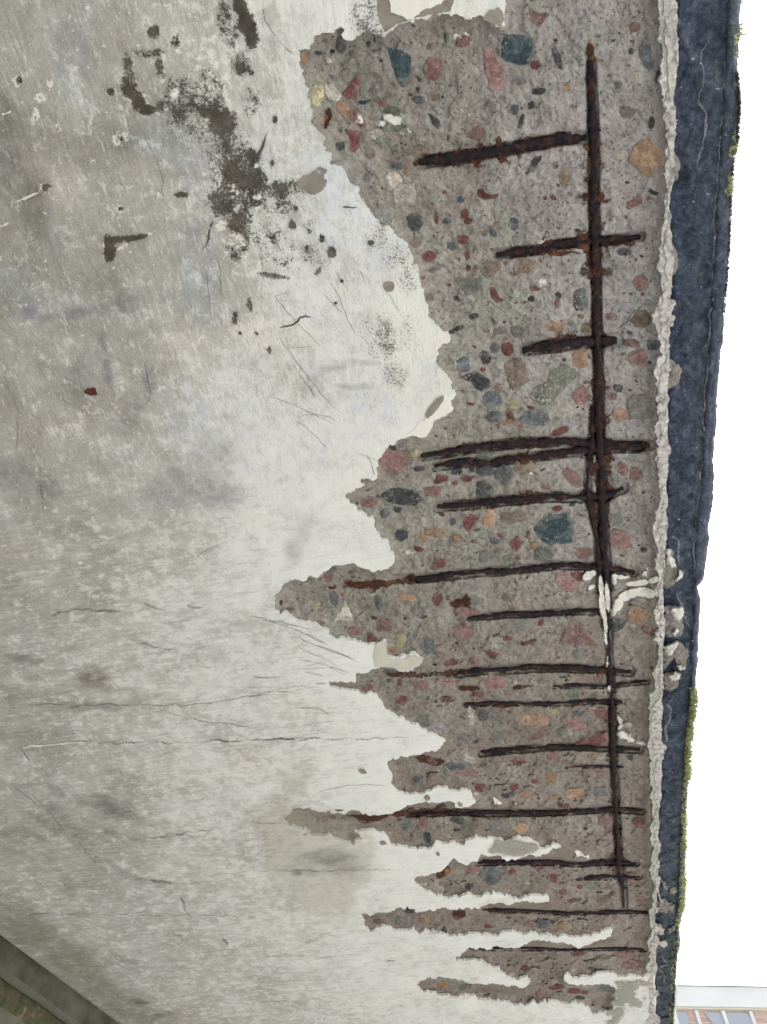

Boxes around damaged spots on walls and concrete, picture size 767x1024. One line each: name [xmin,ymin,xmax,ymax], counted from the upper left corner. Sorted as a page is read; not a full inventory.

leakage [120,0,337,280]
leakage [102,231,153,264]
leakage [367,221,427,291]
leakage [232,294,259,335]
rust [413,114,635,530]
spalling [274,0,667,1024]
leakage [583,0,728,1024]
rust [328,573,423,590]
crack [22,688,396,760]
rust [386,669,508,709]
rust [414,755,444,767]
rust [330,805,478,823]